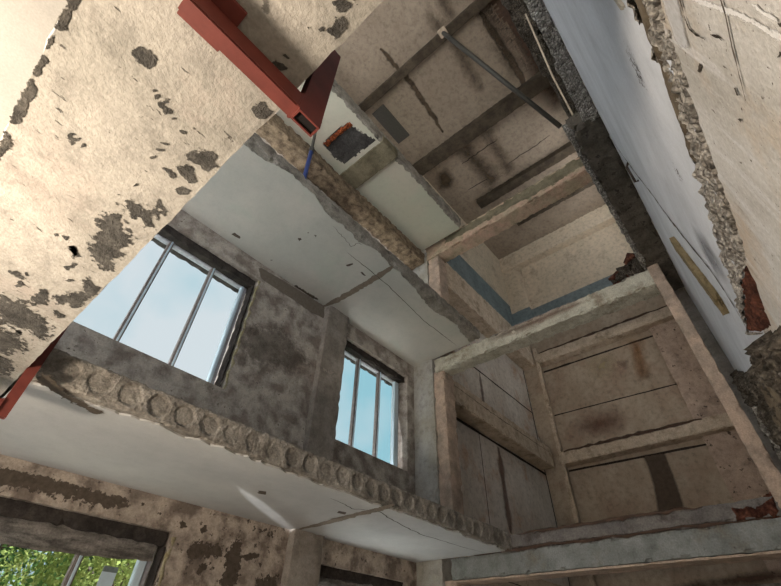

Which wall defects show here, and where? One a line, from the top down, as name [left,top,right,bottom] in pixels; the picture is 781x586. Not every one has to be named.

spalling [9,0,80,124]
spalling [152,89,175,120]
spalling [0,131,13,157]
spalling [162,149,219,195]
spalling [0,194,168,376]
crack [334,227,453,343]
spalling [730,266,781,460]
flaking render [731,492,781,521]
peeling [186,525,260,586]
peeling [255,573,279,586]